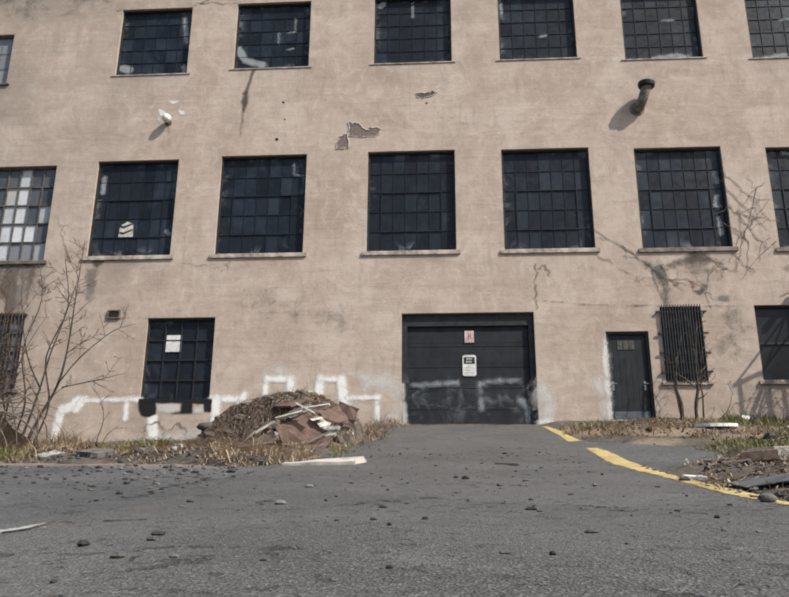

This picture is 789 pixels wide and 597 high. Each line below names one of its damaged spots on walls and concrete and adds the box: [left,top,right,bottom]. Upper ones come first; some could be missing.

spalling [416,90,438,104]
spalling [336,121,381,150]
water stain [0,260,47,314]
water stain [657,252,710,302]